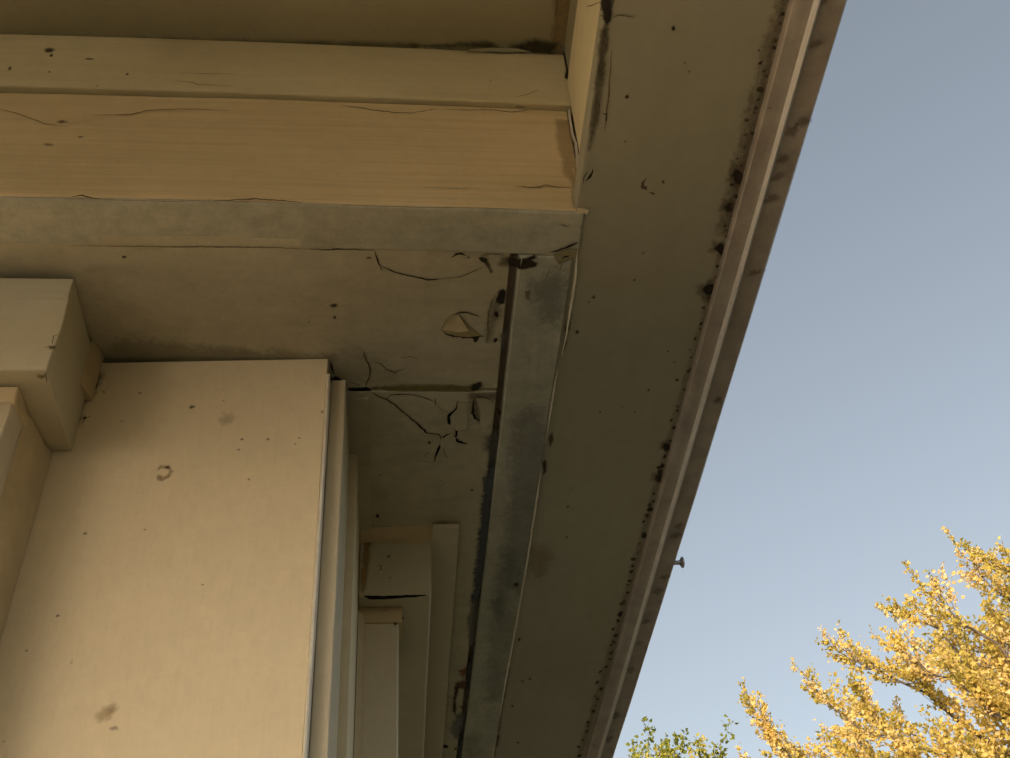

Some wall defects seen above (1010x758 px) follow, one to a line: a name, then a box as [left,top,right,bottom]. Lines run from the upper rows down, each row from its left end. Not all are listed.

damp [590,24,607,142]
crack [90,245,504,281]
crack [349,351,468,463]
crack [364,593,427,601]
damp [467,431,499,698]
damp [452,714,467,758]